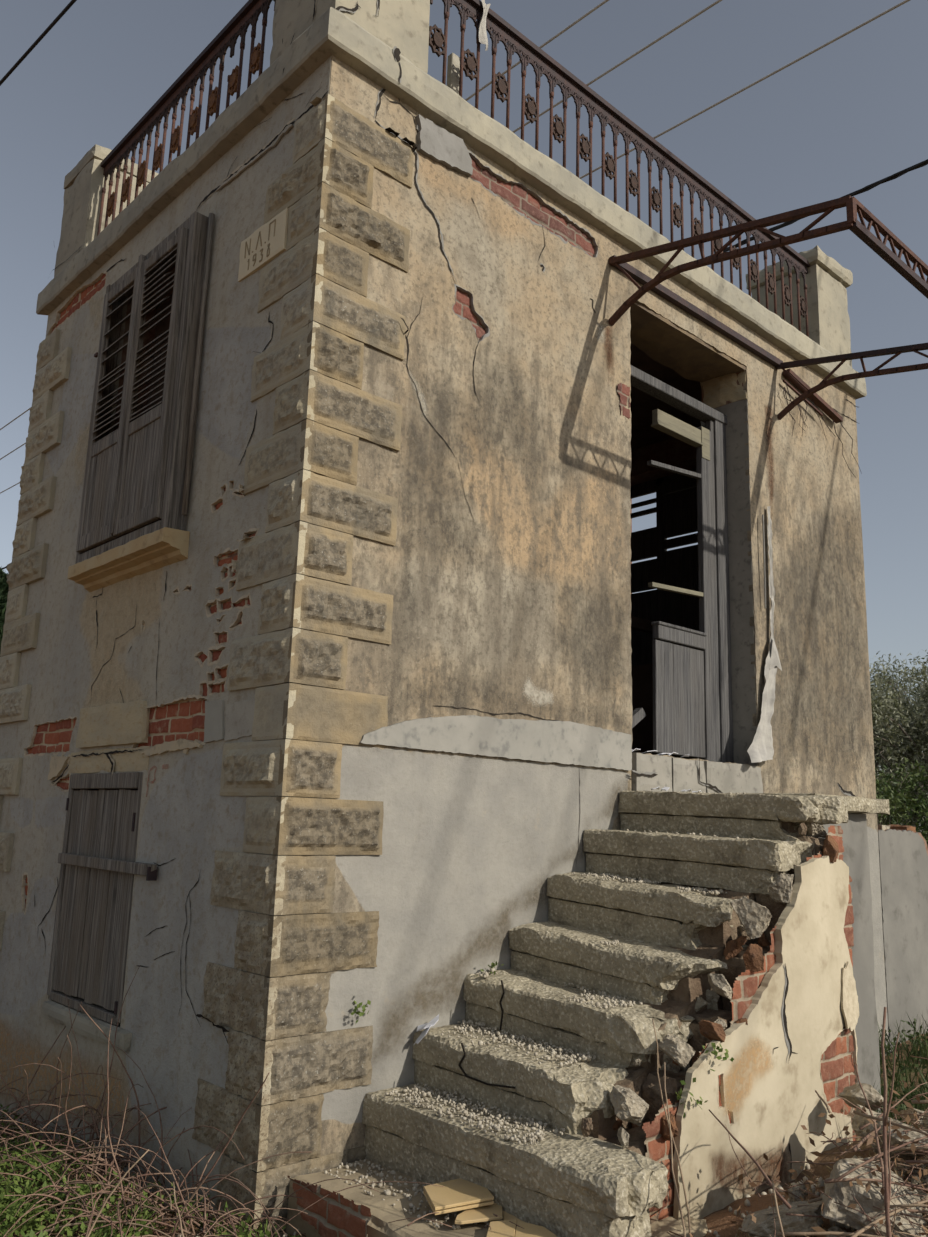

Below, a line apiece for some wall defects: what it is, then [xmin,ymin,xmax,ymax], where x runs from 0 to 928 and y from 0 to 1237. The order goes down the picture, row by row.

crack [197,0,380,209]
crack [374,46,457,281]
spalling [416,114,598,258]
spalling [452,284,490,343]
spalling [24,716,77,792]
spalling [132,528,259,756]
leakage [525,681,552,704]
crack [137,858,229,1043]
crack [458,1043,516,1089]
crack [498,980,506,1031]
spalling [717,1072,734,1127]
spalling [820,875,859,1118]